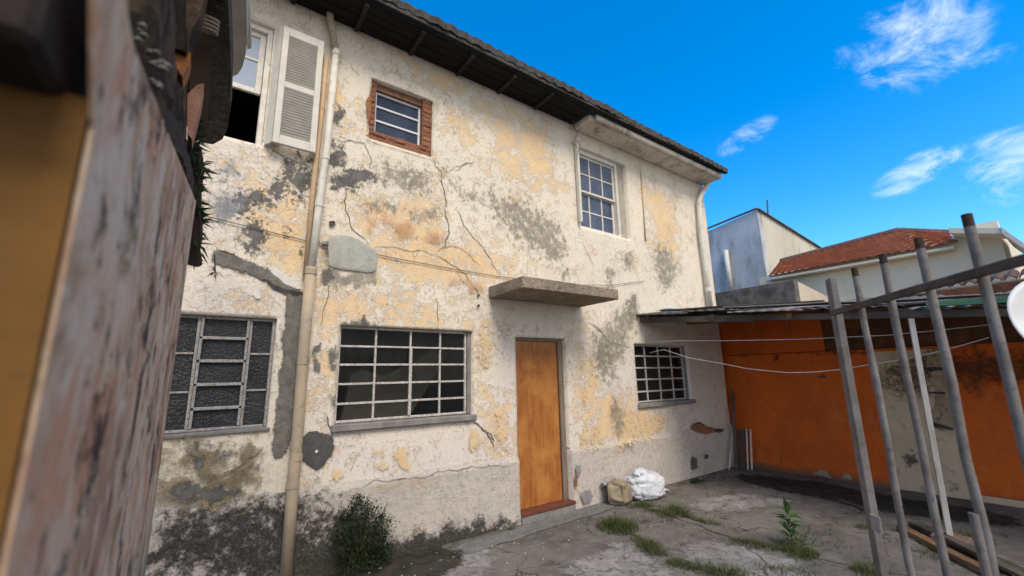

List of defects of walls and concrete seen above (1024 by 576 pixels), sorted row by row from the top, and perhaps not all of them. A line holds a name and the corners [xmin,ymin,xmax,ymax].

damp [333,104,346,126]
spalling [366,83,432,156]
damp [209,139,573,279]
crack [341,159,501,298]
damp [653,243,676,292]
peeling [451,276,497,370]
peeling [576,294,665,453]
damp [881,356,931,395]
damp [952,345,1002,393]
damp [155,430,264,520]
peeling [372,446,411,472]
crack [349,422,511,491]